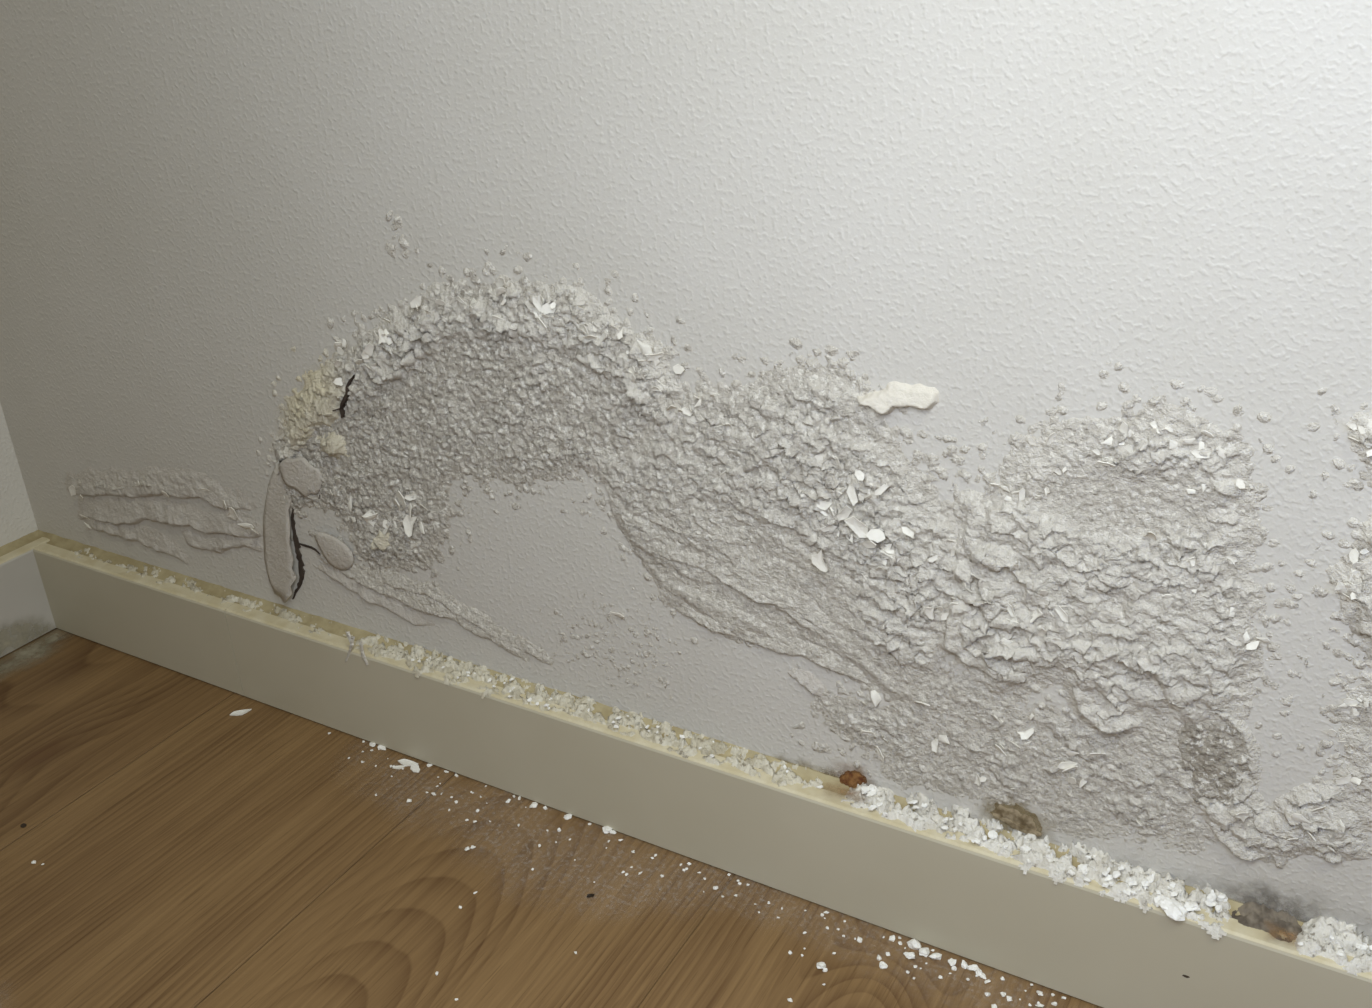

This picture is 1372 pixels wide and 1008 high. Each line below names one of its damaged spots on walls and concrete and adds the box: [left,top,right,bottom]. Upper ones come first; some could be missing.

peeling [227,461,297,603]
crack [291,493,322,599]
flaking render [788,361,1372,856]
flaking render [393,759,420,773]